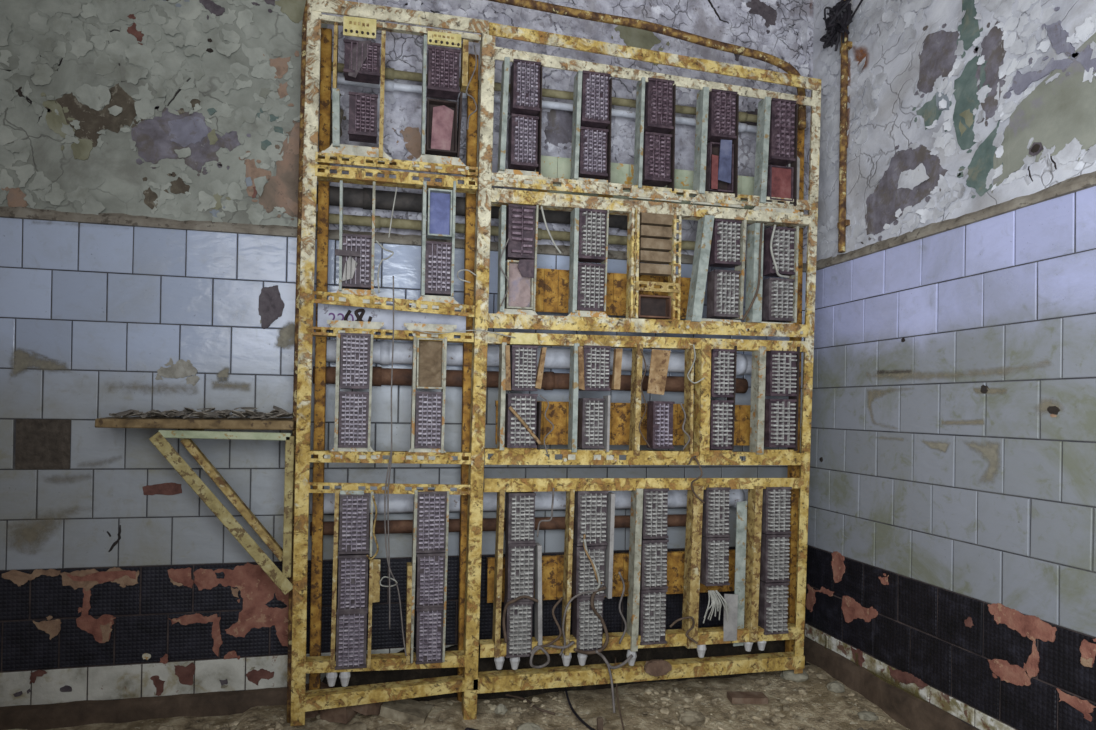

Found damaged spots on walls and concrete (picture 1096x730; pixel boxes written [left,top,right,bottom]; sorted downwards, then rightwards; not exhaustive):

peeling [0,0,306,225]
peeling [317,62,426,191]
peeling [345,0,577,169]
peeling [611,0,1096,258]
spalling [258,285,285,329]
peeling [15,419,71,469]
crack [107,525,121,552]
spalling [2,567,139,643]
spalling [168,562,289,660]
spalling [806,551,878,623]
spalling [987,603,1057,686]
spalling [1080,638,1096,668]